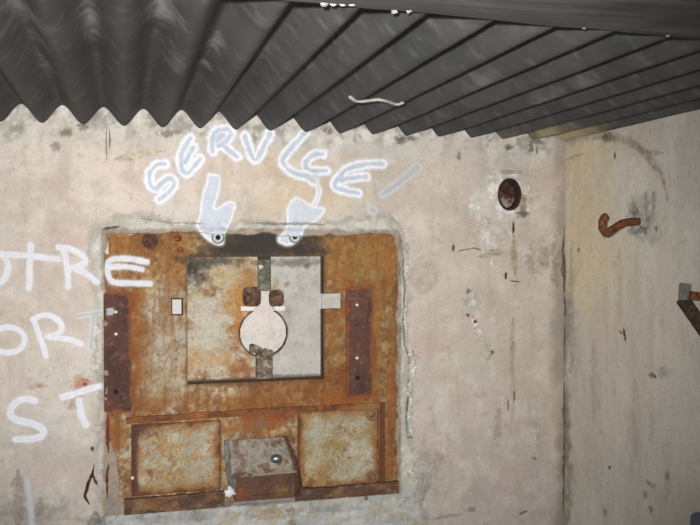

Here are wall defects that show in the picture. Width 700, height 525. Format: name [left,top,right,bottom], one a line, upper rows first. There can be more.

crack [400,236,410,363]
crack [405,382,413,438]
crack [84,414,110,505]